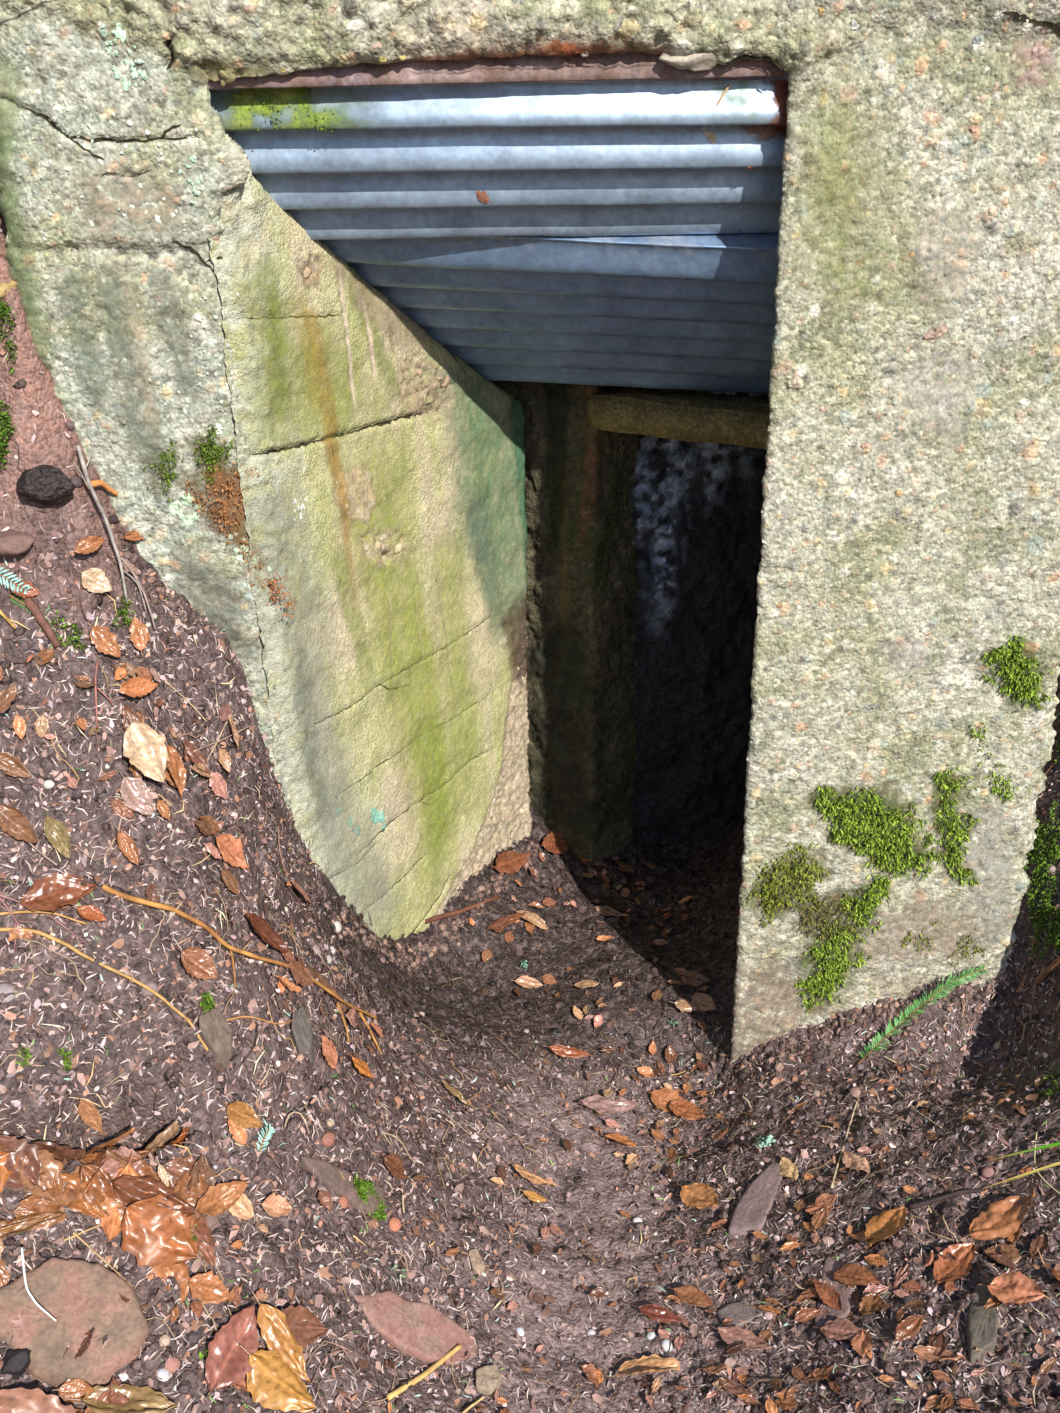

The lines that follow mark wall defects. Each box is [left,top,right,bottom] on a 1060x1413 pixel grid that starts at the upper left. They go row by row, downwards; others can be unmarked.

rust [450,40,662,62]
crack [1002,11,1060,35]
crack [2,97,197,177]
rust [741,80,789,140]
crack [251,345,472,460]
leakage [453,371,605,836]
leakage [354,467,449,840]